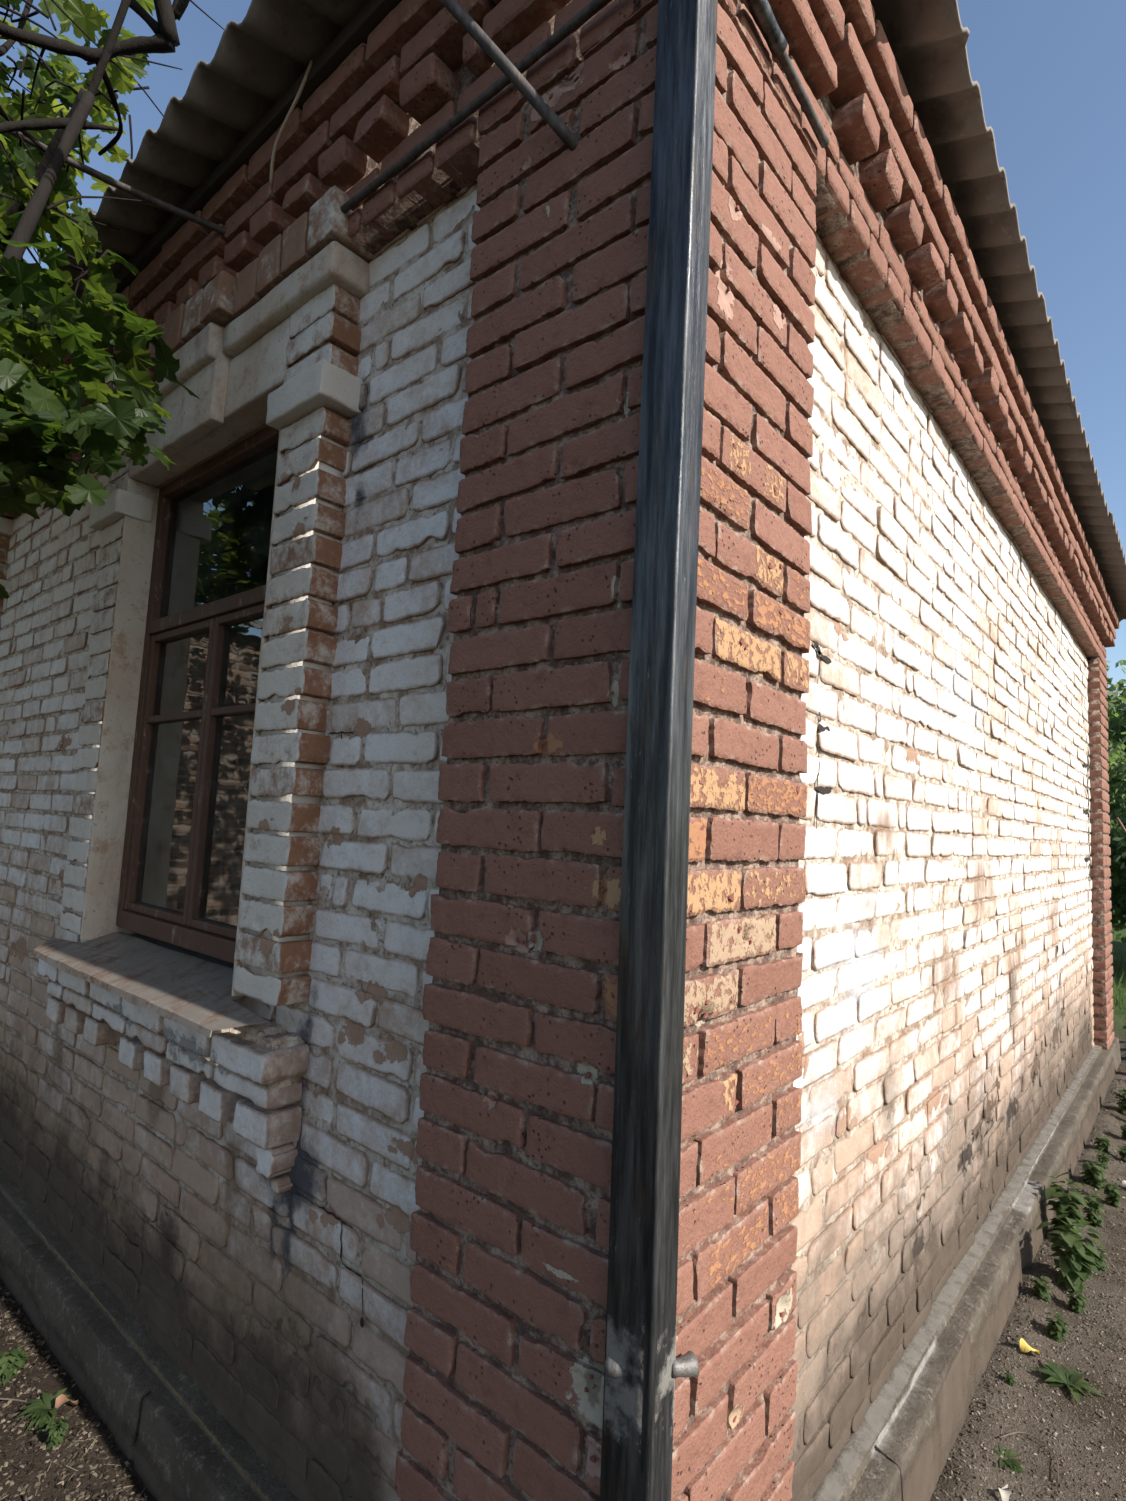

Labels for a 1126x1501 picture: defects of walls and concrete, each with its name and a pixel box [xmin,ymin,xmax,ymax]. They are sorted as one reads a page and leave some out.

peeling [697,545,811,708]
peeling [680,765,810,1289]
damp [0,1067,380,1501]
spalling [566,1357,605,1479]